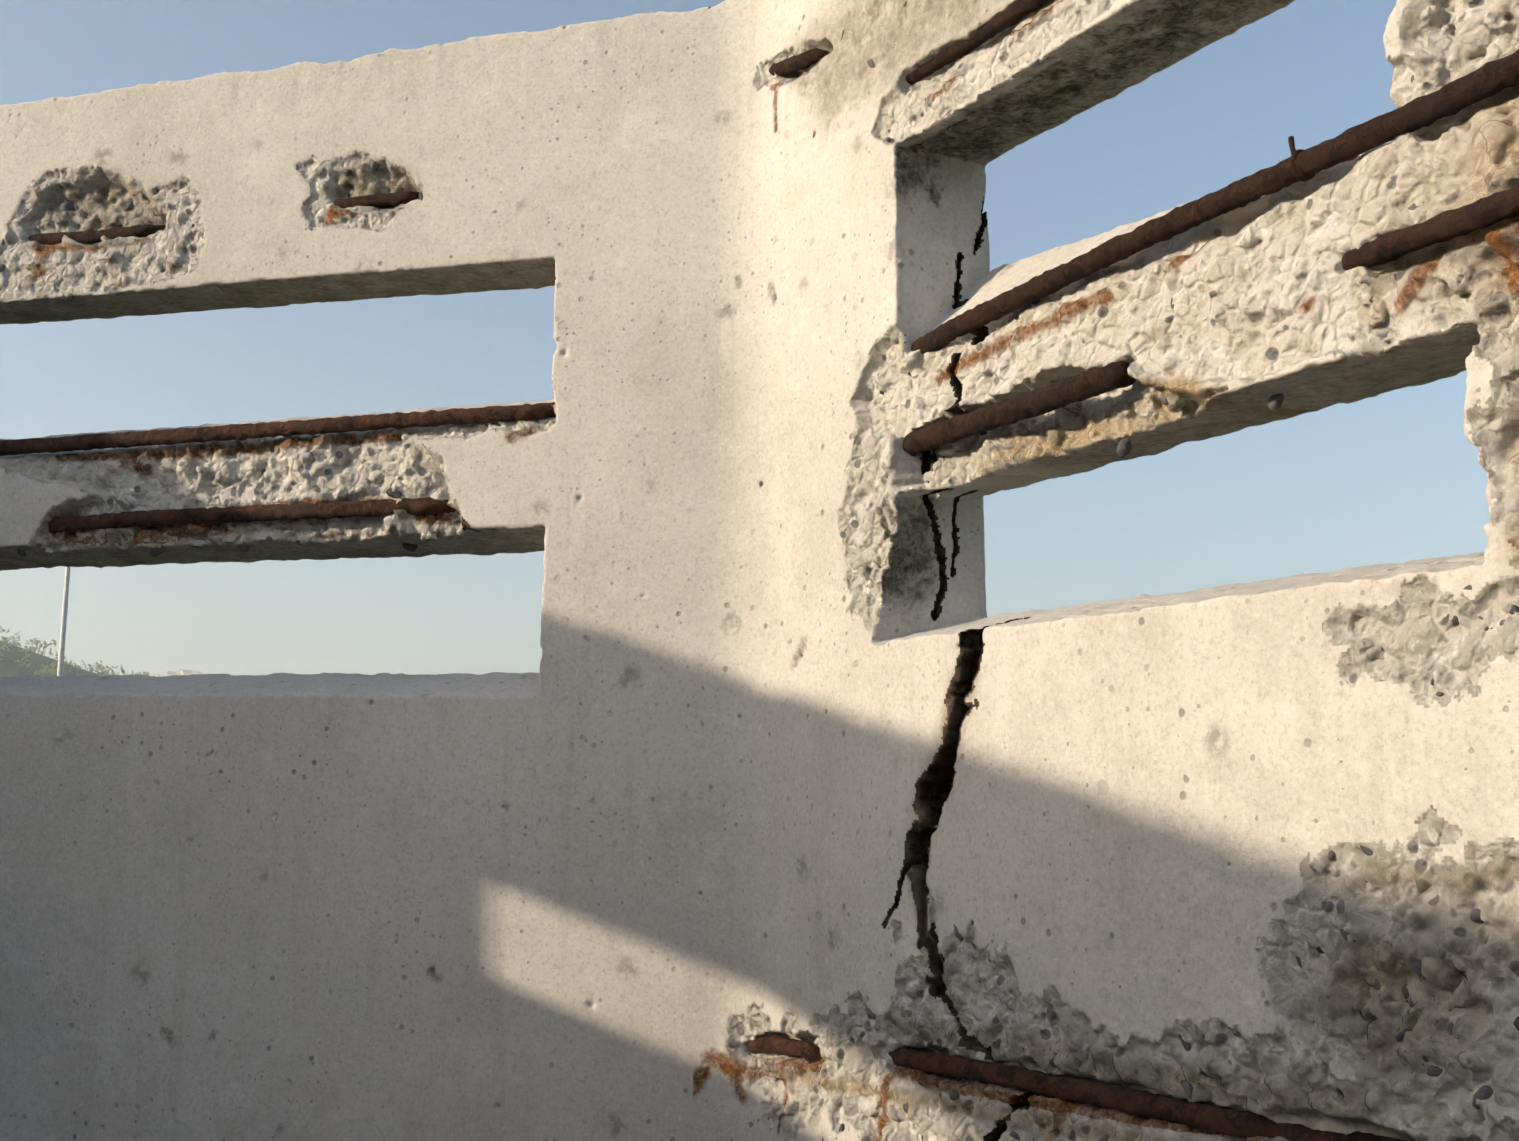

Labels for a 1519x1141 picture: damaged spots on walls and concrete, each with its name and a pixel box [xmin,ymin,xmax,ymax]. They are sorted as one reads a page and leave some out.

spalling [0,163,207,303]
spalling [296,150,425,233]
corrosion [1169,242,1207,267]
corrosion [1395,259,1440,311]
corrosion [935,291,1113,385]
spalling [837,0,1519,709]
corrosion [56,432,401,476]
spalling [0,380,556,556]
crack [881,197,1040,1141]
spalling [724,805,1519,1141]
corrosion [693,1049,825,1133]
corrosion [876,1064,1267,1141]